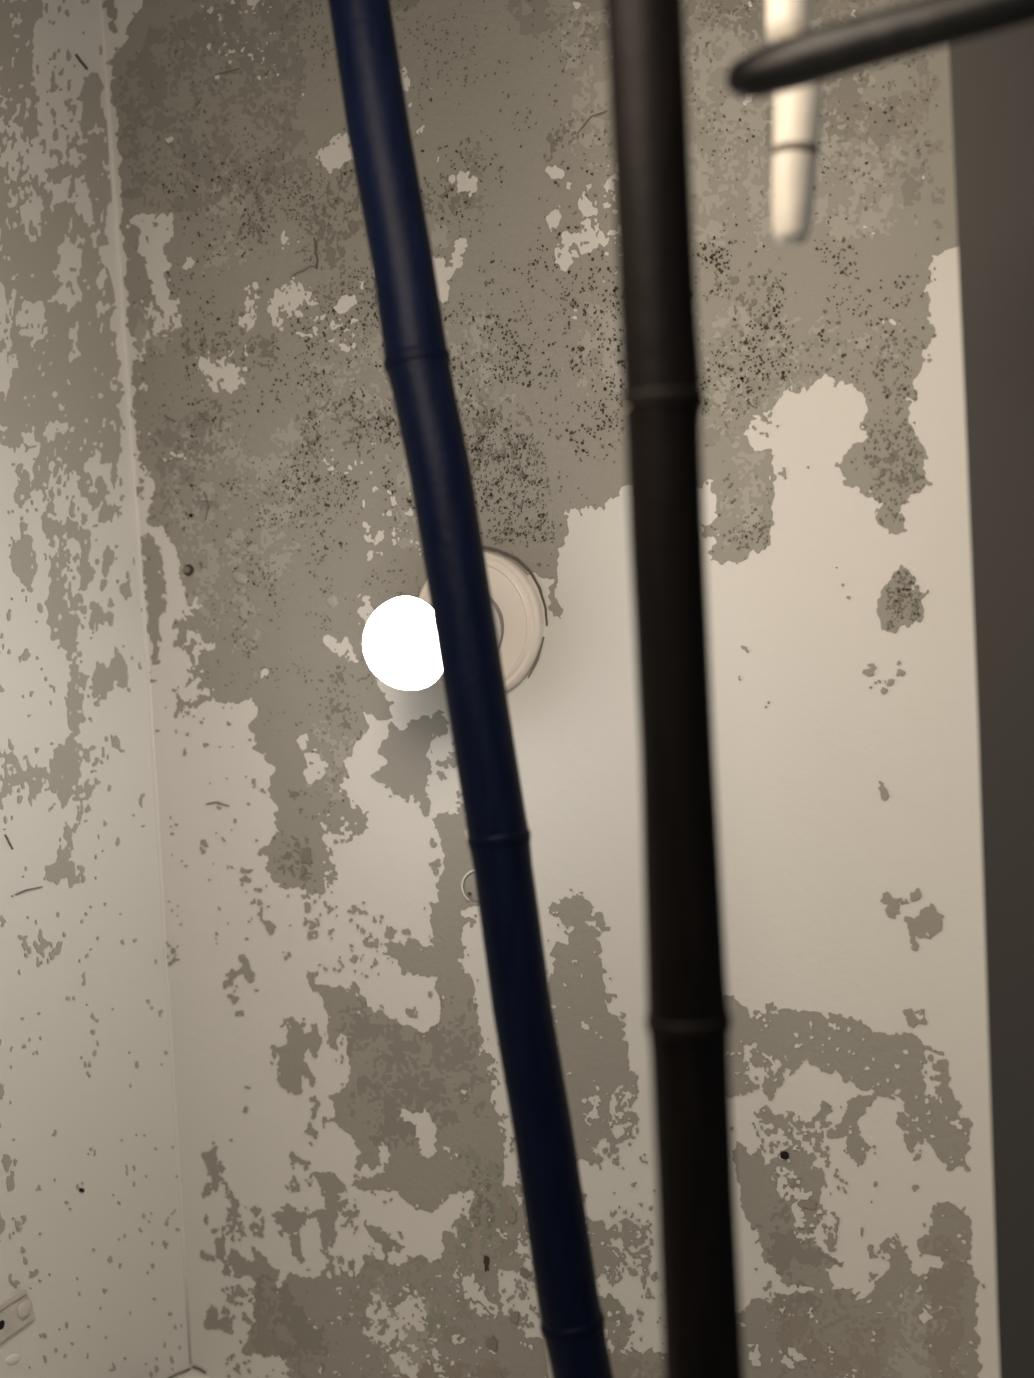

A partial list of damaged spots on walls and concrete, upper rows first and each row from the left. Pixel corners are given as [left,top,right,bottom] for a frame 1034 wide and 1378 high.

peeling [390,0,627,619]
peeling [685,0,958,565]
peeling [0,0,548,1378]
peeling [877,565,929,634]
peeling [547,889,648,1187]
peeling [880,888,944,951]
peeling [586,1190,664,1378]